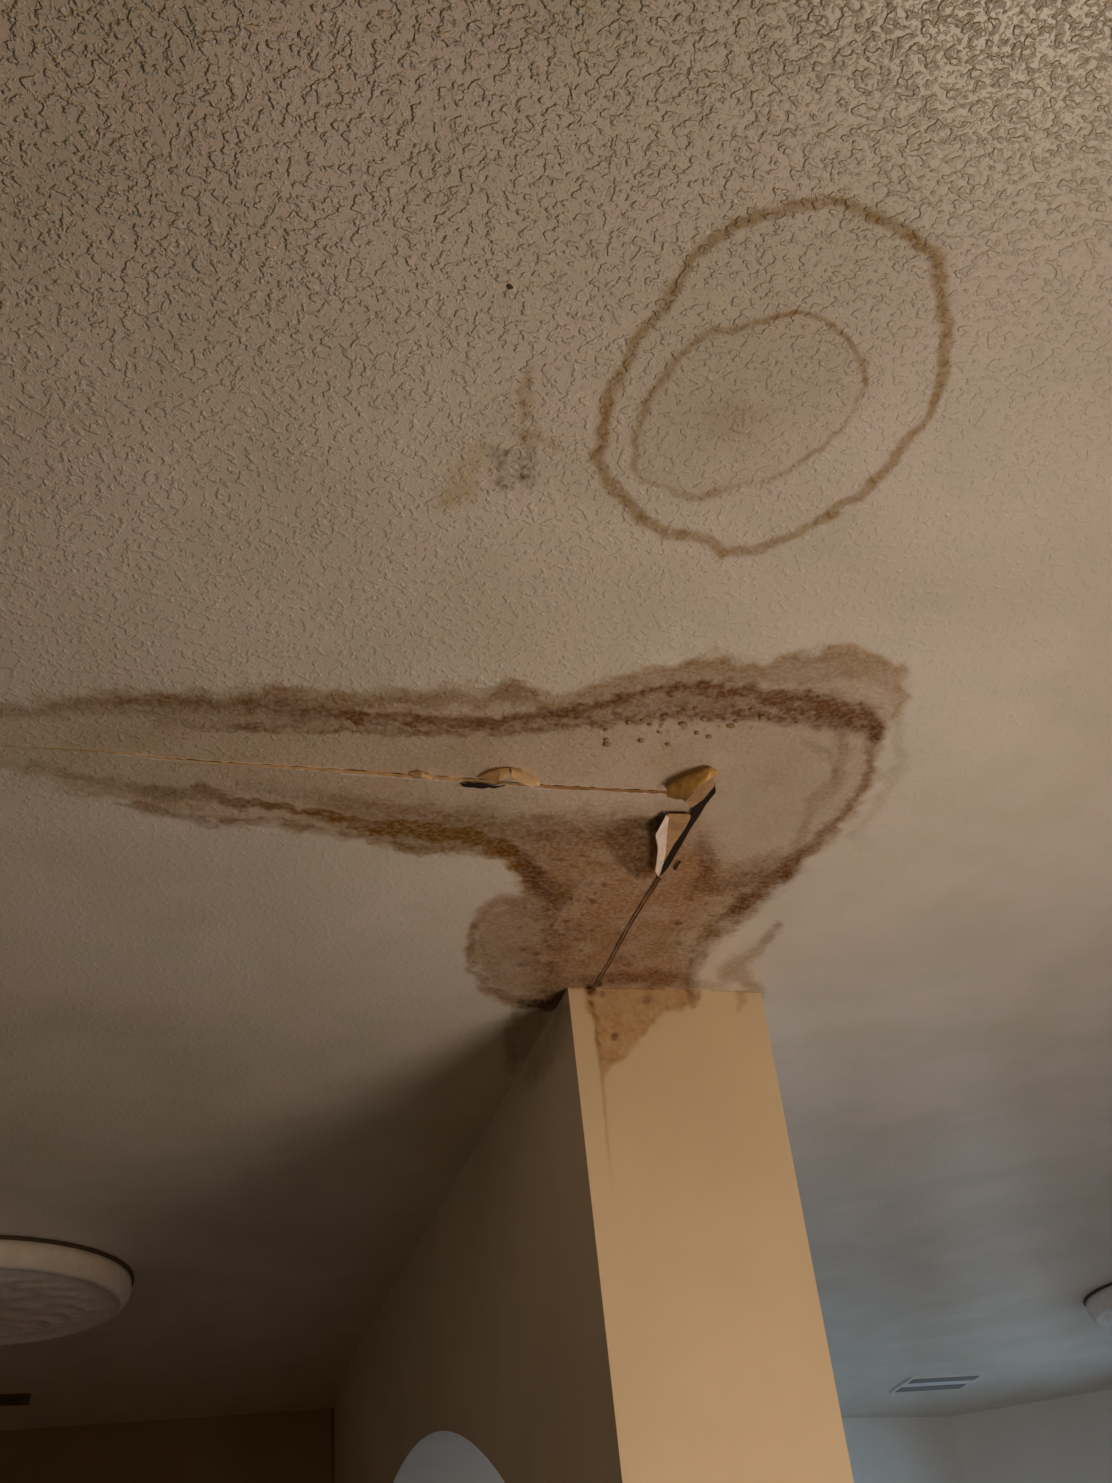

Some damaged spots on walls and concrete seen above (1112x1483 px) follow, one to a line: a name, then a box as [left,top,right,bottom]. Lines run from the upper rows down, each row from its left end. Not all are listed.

water stain [405,682,883,739]
crack [12,746,667,794]
water stain [248,802,538,875]
crack [593,861,681,991]